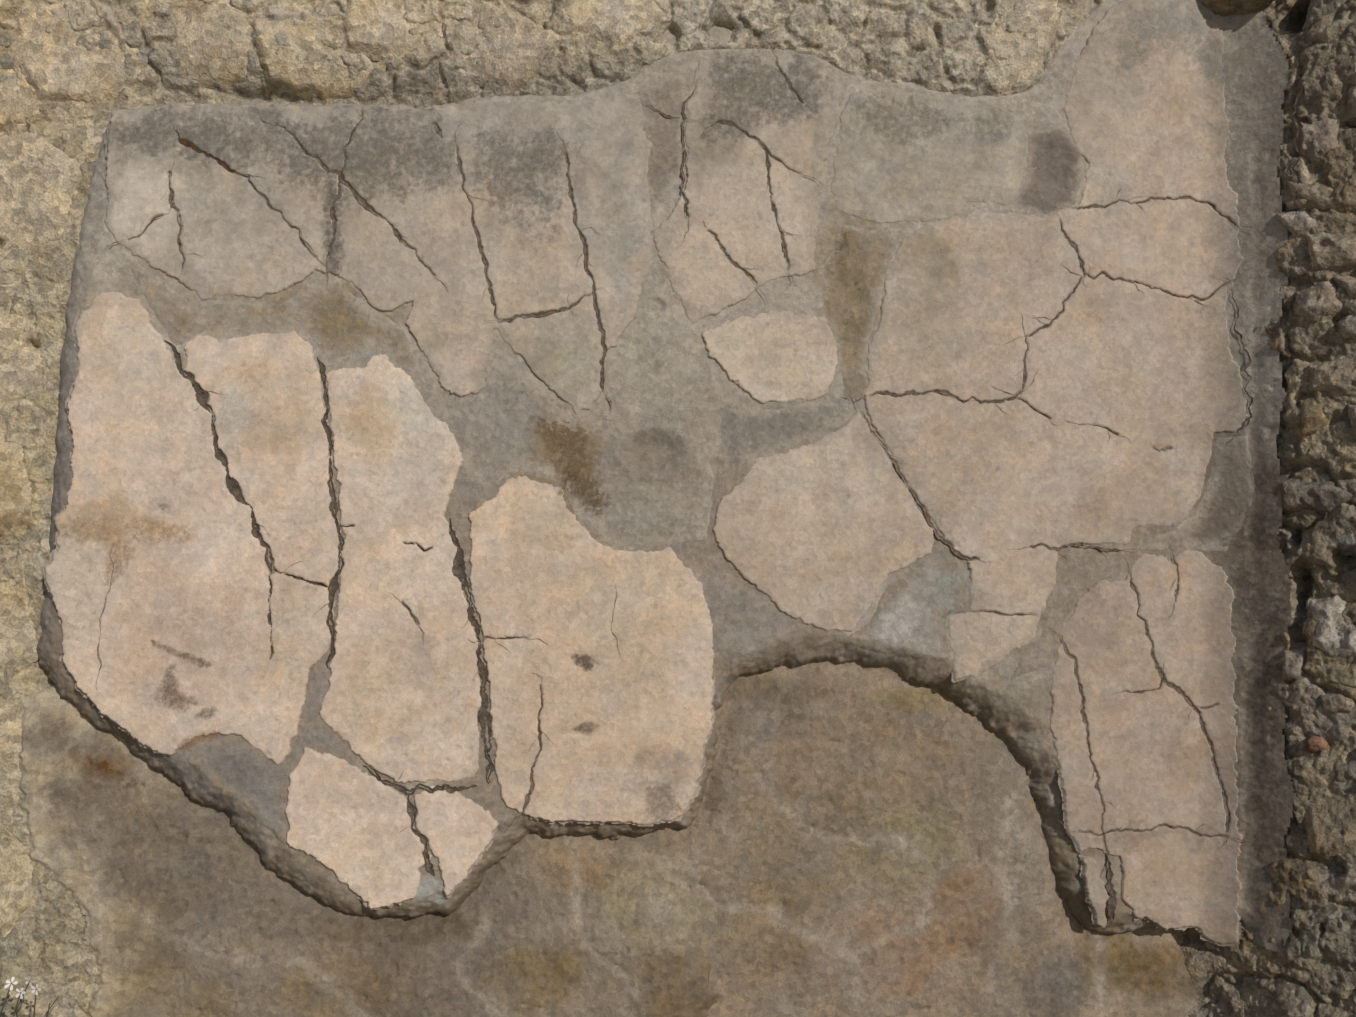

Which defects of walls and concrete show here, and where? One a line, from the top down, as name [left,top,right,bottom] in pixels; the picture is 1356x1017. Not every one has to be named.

crack [165,340,352,668]
crack [103,90,448,291]
crack [363,518,551,876]
crack [435,124,612,414]
crack [611,586,621,657]
spalling [18,262,1245,1017]
peeling [102,0,1256,683]
crack [635,75,822,304]
crack [775,44,811,114]
crack [844,186,1267,919]